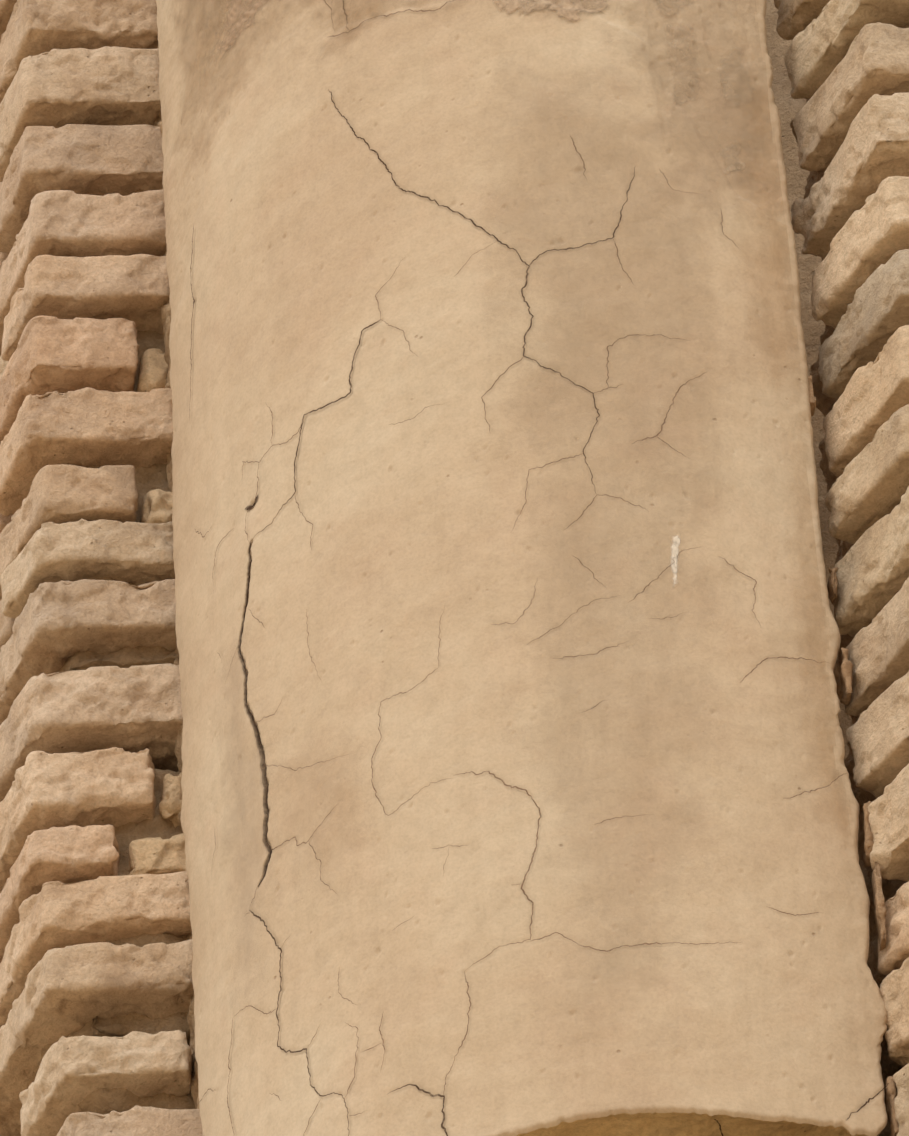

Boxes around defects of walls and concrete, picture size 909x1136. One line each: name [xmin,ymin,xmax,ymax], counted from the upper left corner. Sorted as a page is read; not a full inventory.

crack [324,0,454,37]
crack [329,91,690,528]
crack [723,558,757,619]
crack [196,260,734,1136]
crack [744,657,822,678]